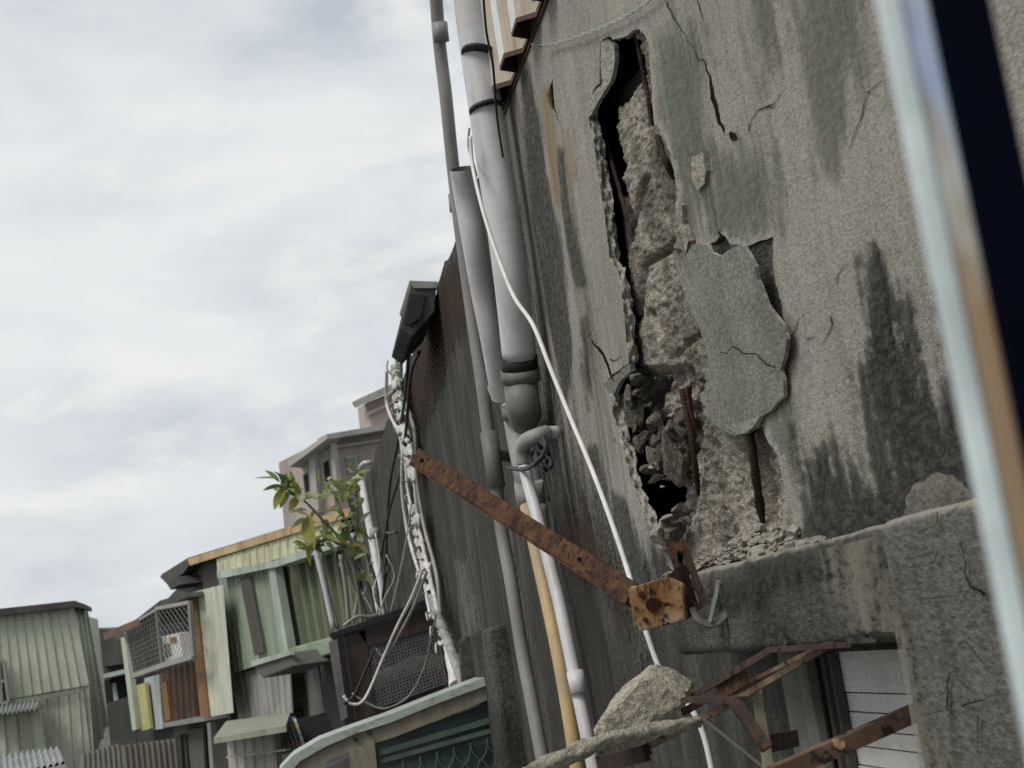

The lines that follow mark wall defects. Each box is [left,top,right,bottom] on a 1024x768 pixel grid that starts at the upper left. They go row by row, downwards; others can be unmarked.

crack [666,1,782,140]
crack [848,80,881,152]
spalling [588,29,791,575]
water stain [694,240,975,627]
crack [910,511,987,599]
crack [924,642,992,749]